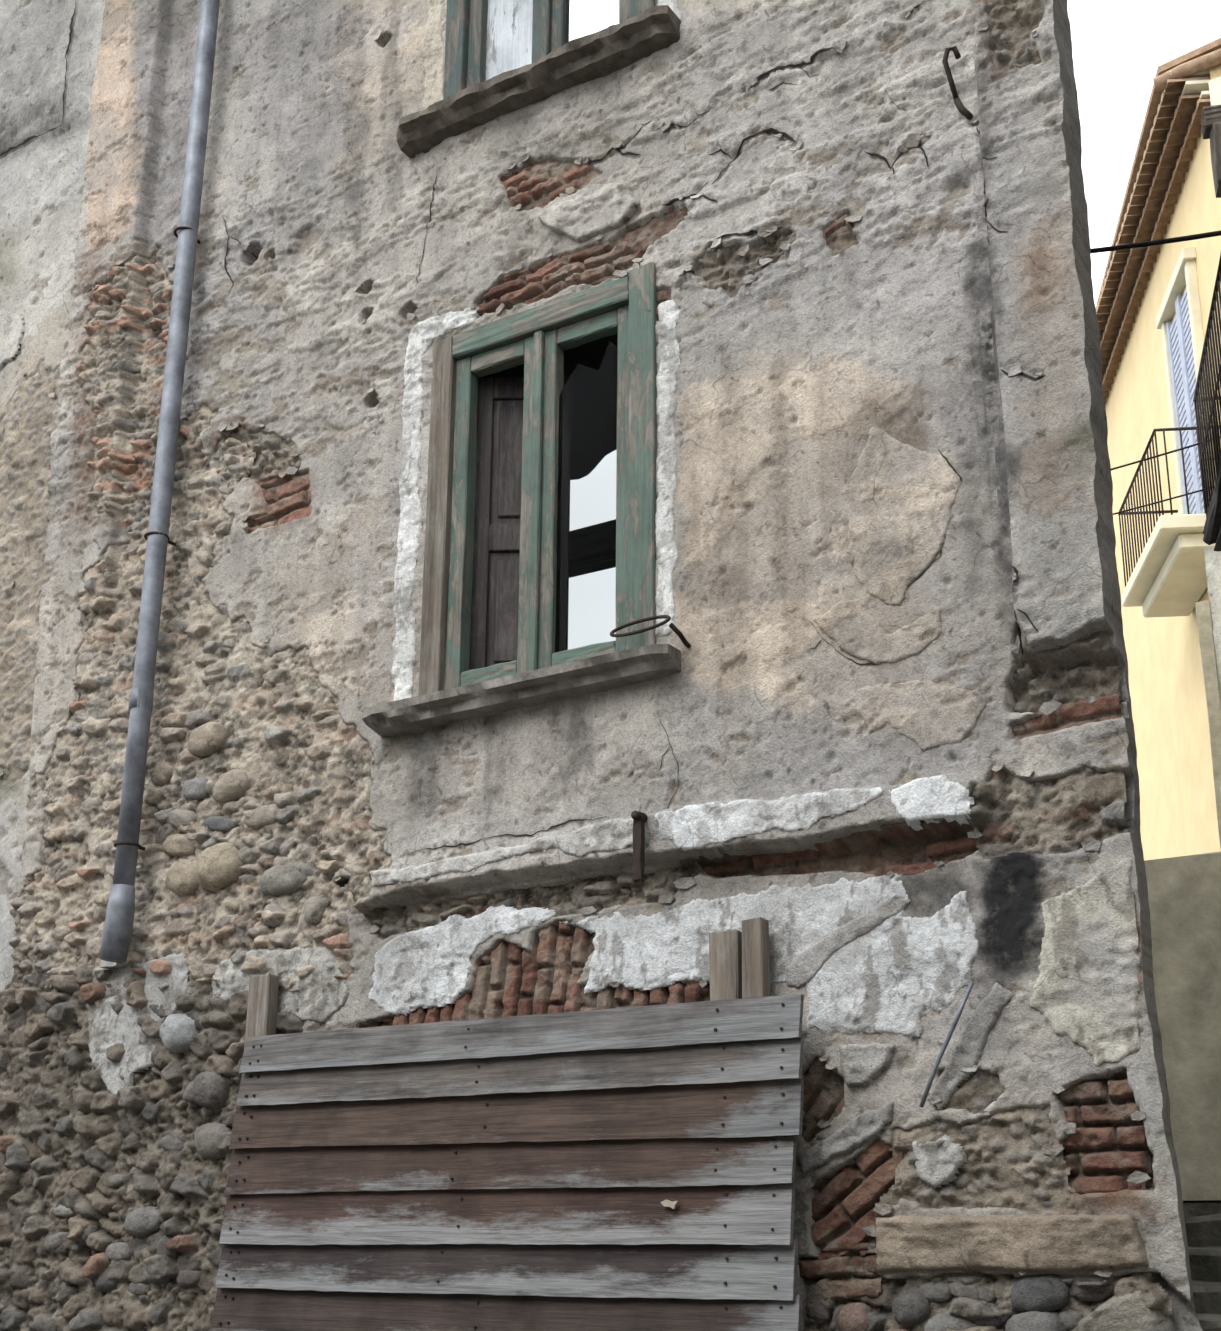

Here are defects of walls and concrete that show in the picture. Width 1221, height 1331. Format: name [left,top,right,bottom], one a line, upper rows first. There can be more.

spalling [977,0,1045,71]
crack [0,1,76,156]
crack [748,41,847,90]
spalling [499,153,602,211]
crack [583,106,716,164]
crack [661,128,803,206]
crack [864,131,932,181]
spalling [693,225,797,298]
crack [717,226,784,257]
spalling [823,212,862,256]
spalling [0,245,1175,1331]
crack [403,817,603,856]